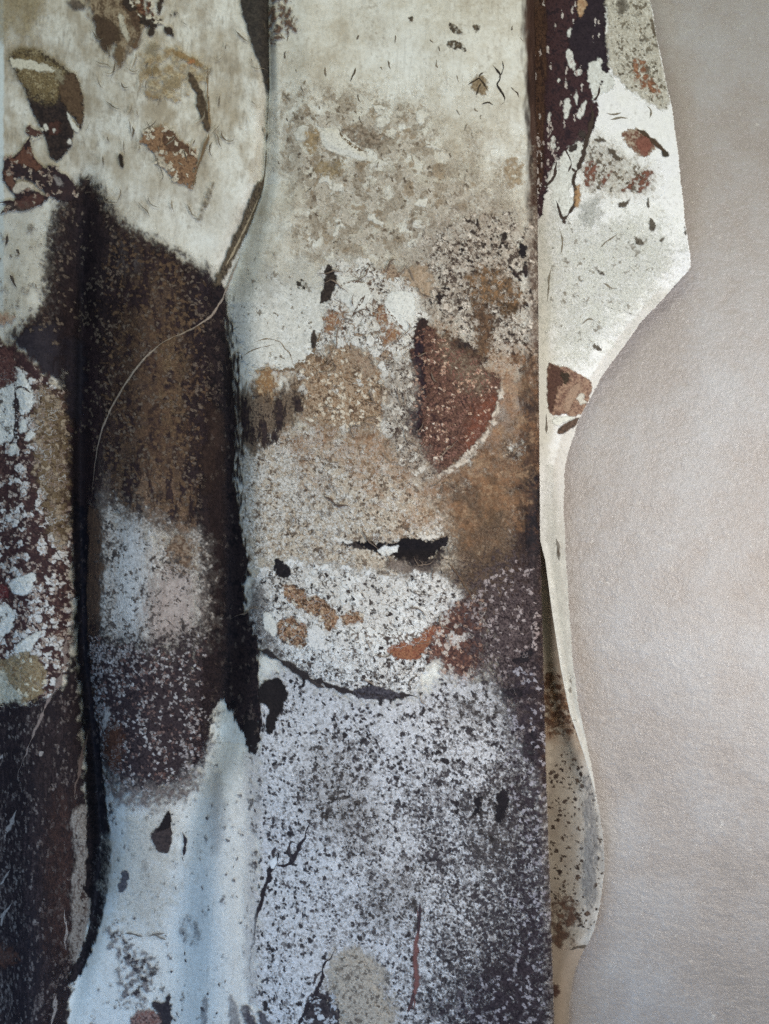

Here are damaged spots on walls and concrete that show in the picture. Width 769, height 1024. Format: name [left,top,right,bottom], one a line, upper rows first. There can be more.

peeling [0,47,84,241]
crack [316,259,436,373]
spalling [227,0,670,580]
water stain [508,243,528,281]
crack [320,461,350,507]
crack [322,380,458,495]
water stain [0,174,306,1024]
crack [260,529,474,706]
water stain [386,351,577,1024]
crack [249,823,310,986]